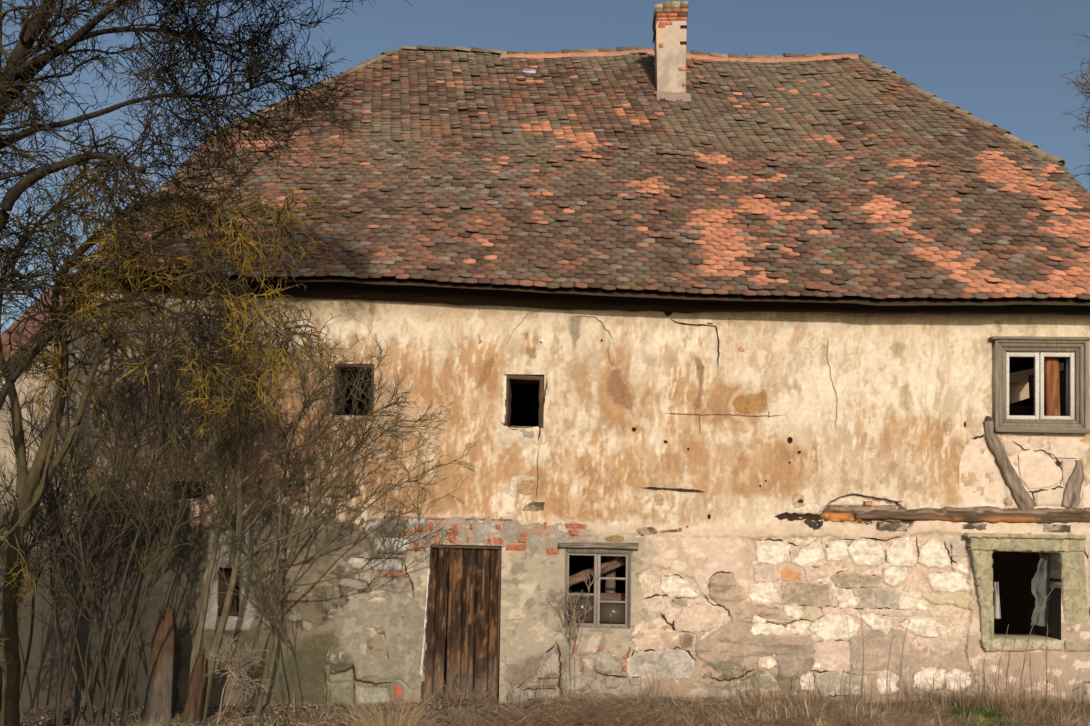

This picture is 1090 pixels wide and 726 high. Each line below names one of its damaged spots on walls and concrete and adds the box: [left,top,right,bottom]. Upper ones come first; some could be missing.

water stain [571,319,579,342]
crack [663,311,720,364]
water stain [696,358,704,408]
flaking render [959,434,1090,509]
flaking render [1043,524,1071,533]
crack [324,552,414,703]
flaking render [250,476,595,676]
flaking render [506,493,993,705]